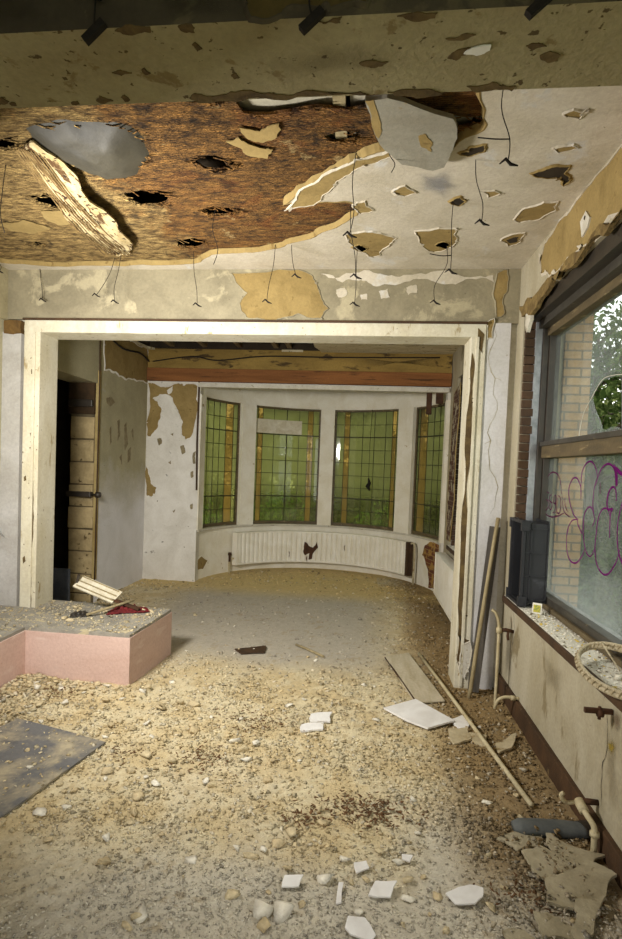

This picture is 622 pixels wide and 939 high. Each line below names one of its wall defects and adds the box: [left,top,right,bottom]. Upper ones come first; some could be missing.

peeling [242,0,371,25]
peeling [562,108,591,120]
flaking render [457,143,488,157]
peeling [284,151,392,214]
peeling [391,185,418,197]
flaking render [447,195,467,207]
peeling [345,230,398,258]
peeling [414,227,459,253]
peeling [500,143,622,332]
peeling [103,340,198,478]
peeling [145,466,157,498]
peeling [231,269,510,679]